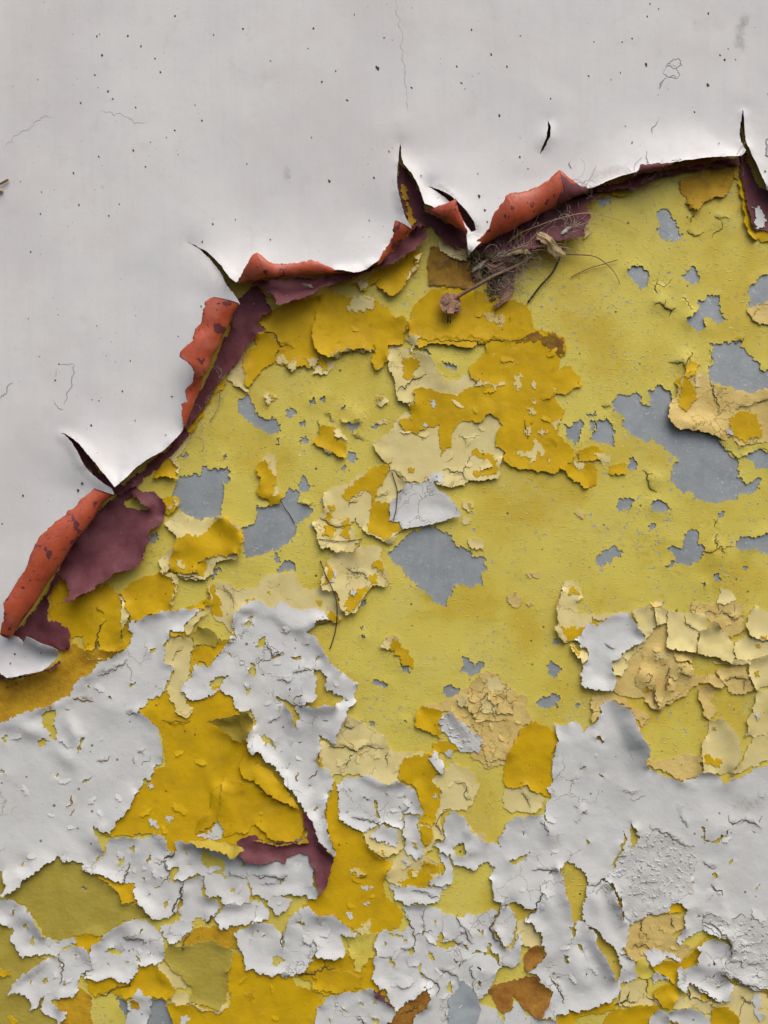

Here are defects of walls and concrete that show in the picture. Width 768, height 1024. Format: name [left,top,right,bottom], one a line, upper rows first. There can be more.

peeling [0,162,611,1024]
peeling [0,0,768,727]
peeling [84,700,768,1024]
peeling [746,689,768,737]